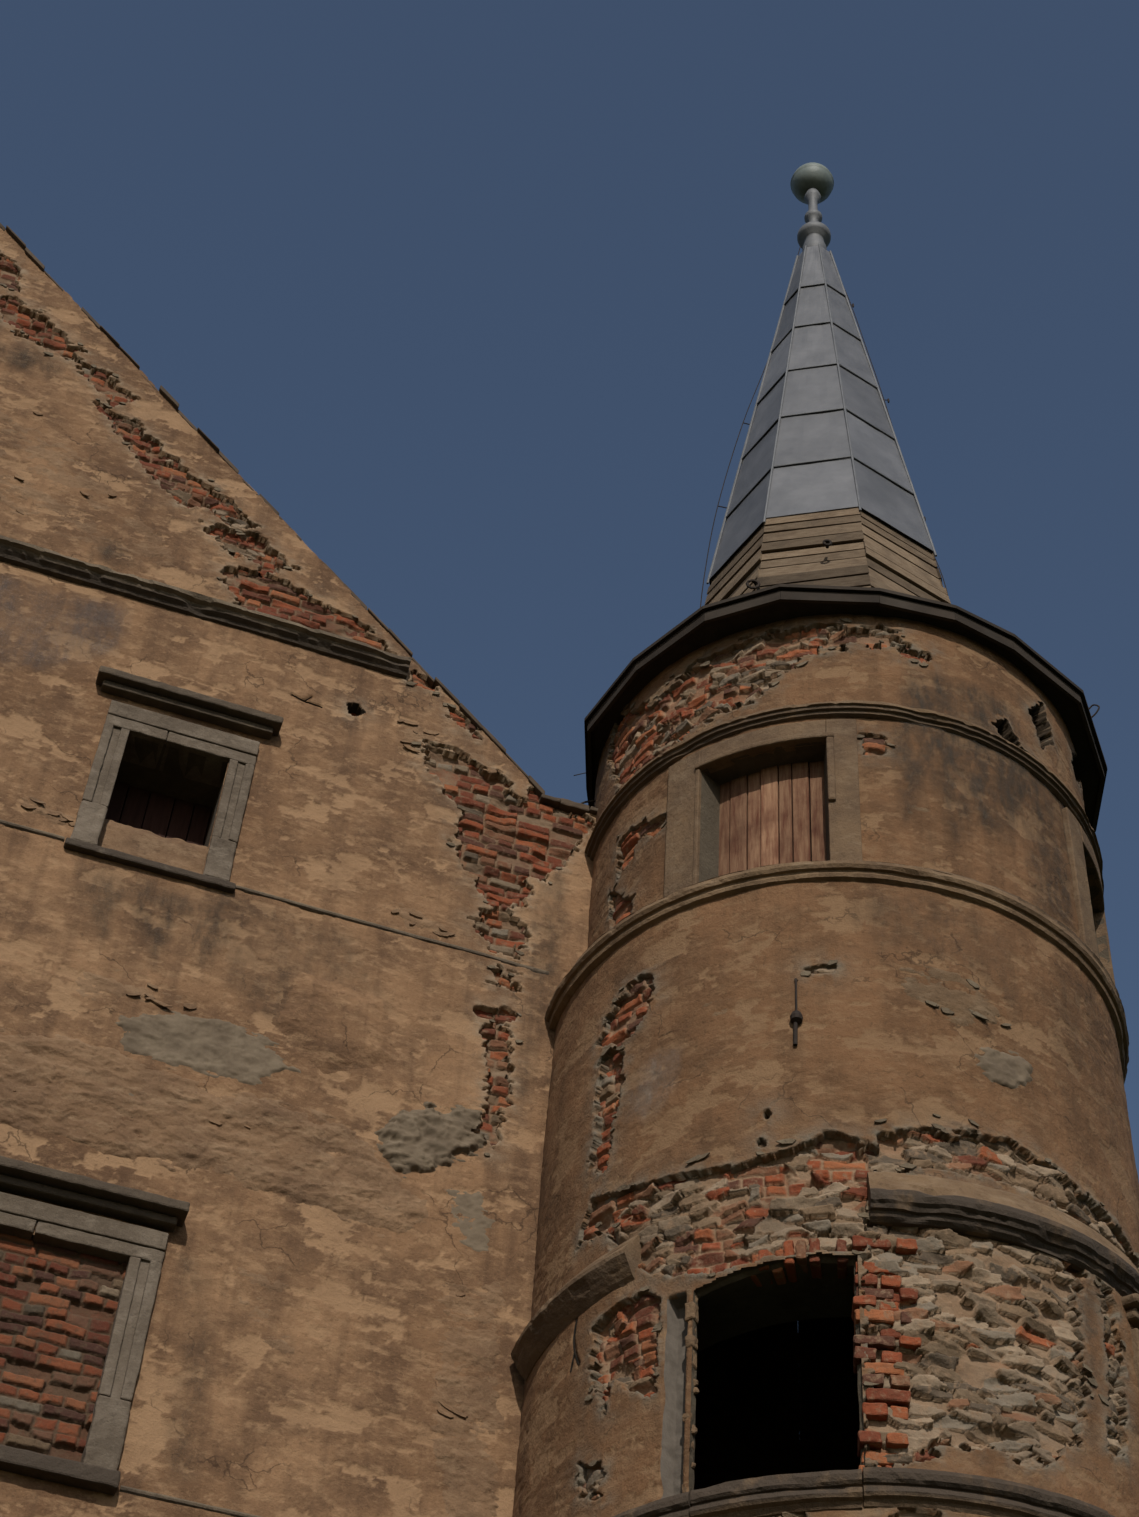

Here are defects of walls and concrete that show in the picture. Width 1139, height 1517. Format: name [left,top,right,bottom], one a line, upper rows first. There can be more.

flaking render [0,256,385,650]
flaking render [608,618,929,794]
flaking render [390,673,593,993]
flaking render [607,816,667,926]
flaking render [473,1009,524,1157]
flaking render [593,978,654,1173]
flaking render [583,1114,1139,1469]